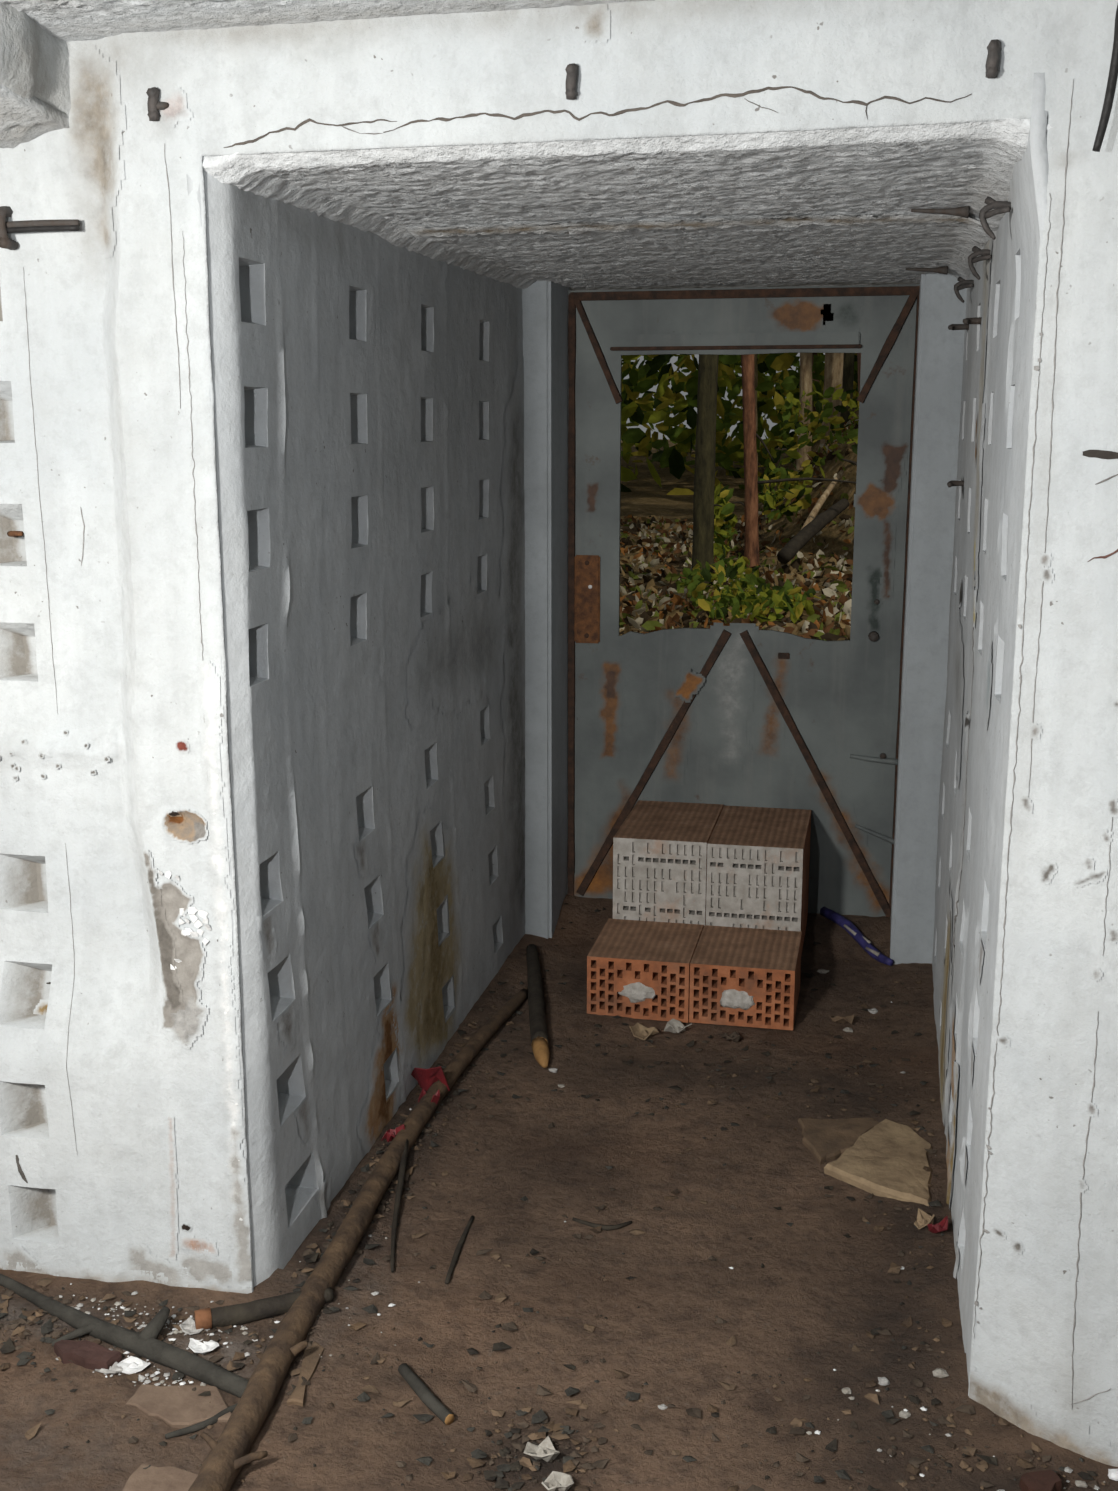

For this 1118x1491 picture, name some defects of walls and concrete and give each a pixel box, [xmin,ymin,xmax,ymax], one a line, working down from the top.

leakage [63,45,126,258]
crack [223,86,972,148]
rust [854,440,910,601]
peeling [124,233,252,1289]